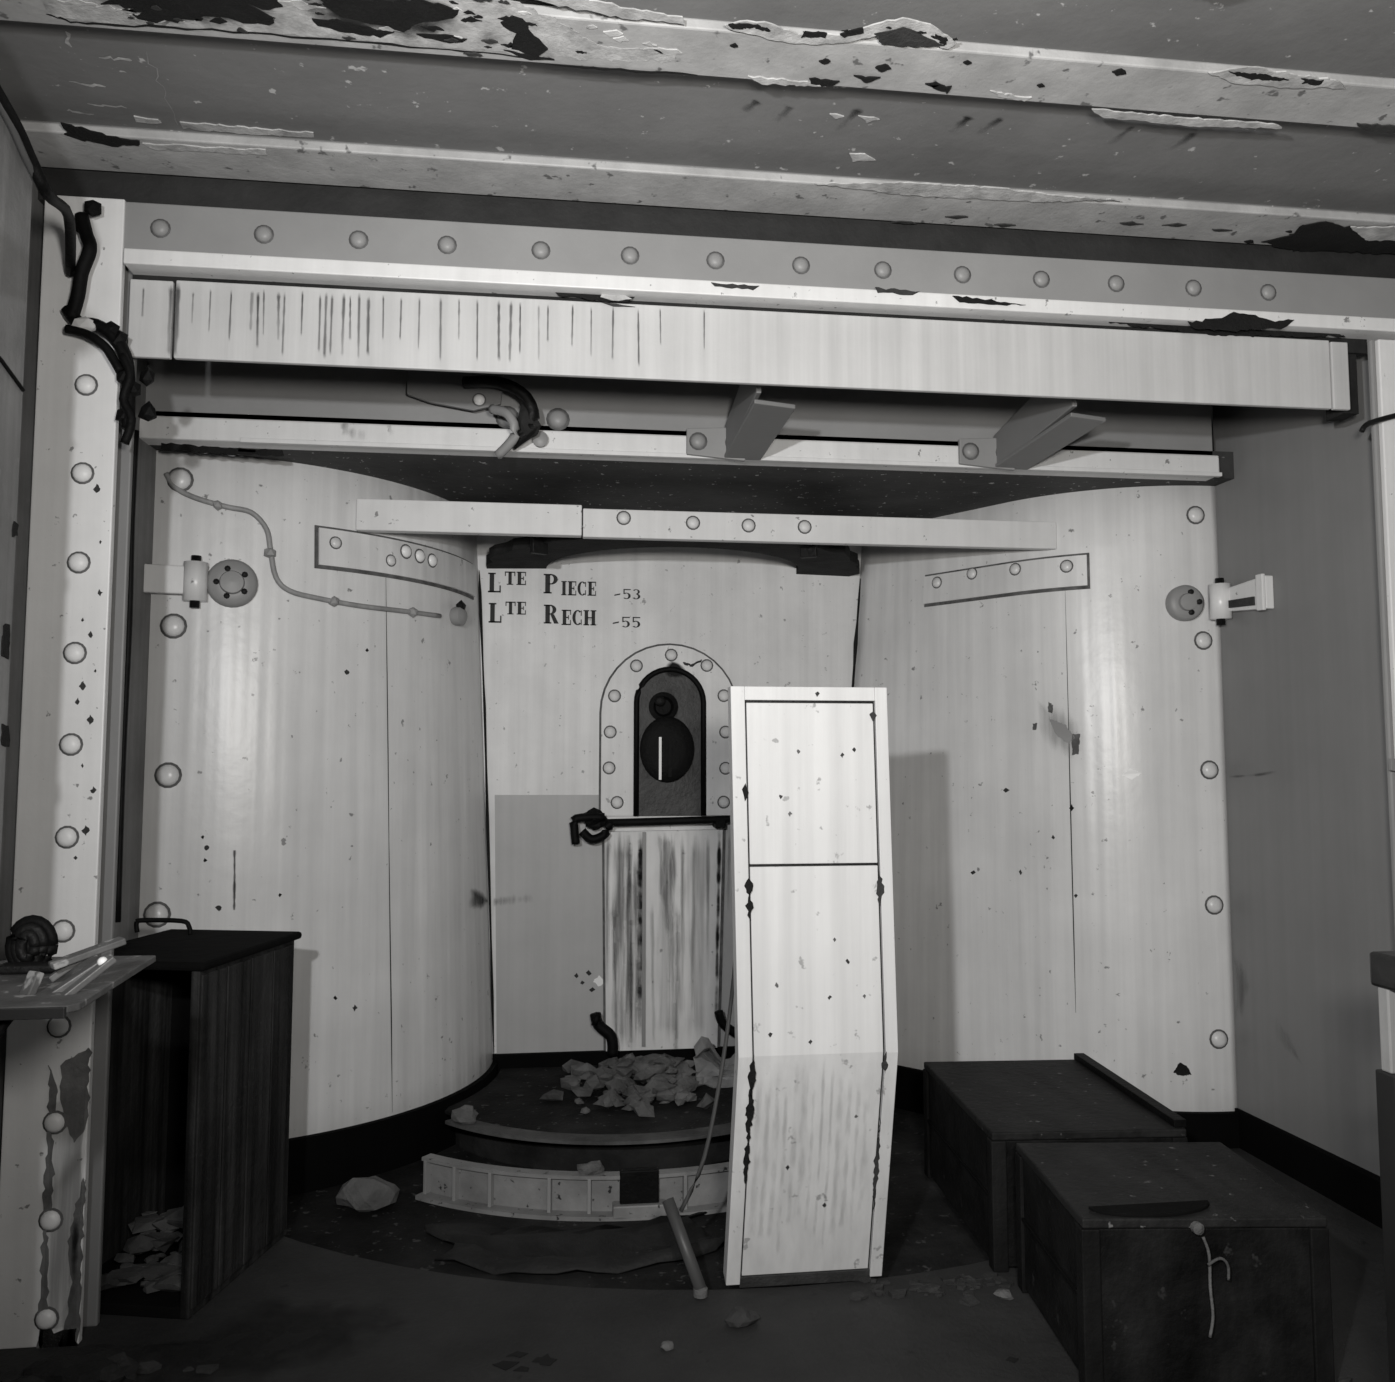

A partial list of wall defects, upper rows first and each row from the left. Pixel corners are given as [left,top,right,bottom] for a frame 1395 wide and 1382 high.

peeling [43,0,685,63]
peeling [725,17,958,87]
peeling [925,81,952,94]
peeling [990,83,1045,102]
peeling [1208,66,1345,89]
peeling [830,113,880,123]
peeling [1092,108,1282,129]
peeling [1357,123,1395,134]
peeling [815,181,1121,219]
spalling [1212,221,1395,255]
rust [614,846,642,1008]